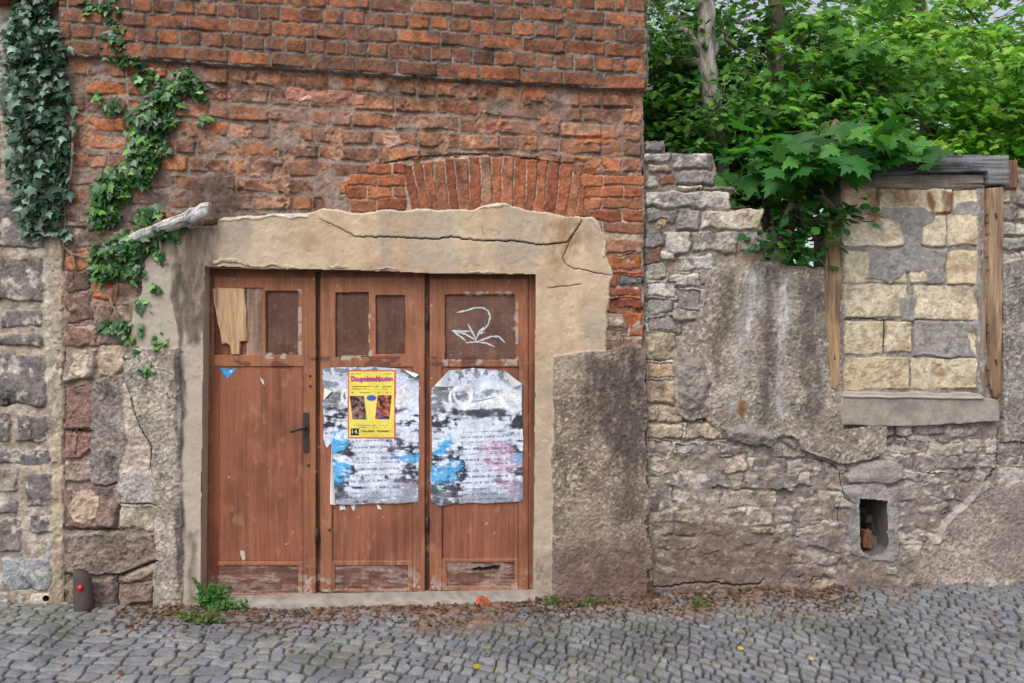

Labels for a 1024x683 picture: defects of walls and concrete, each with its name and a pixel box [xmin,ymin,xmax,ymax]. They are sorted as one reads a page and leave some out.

crack [322,220,607,288]
damp [171,230,215,383]
crack [126,384,152,467]
peeling [720,423,831,461]
crack [814,459,855,519]
spalling [860,528,873,548]
spalling [934,483,991,545]
crack [652,579,762,588]